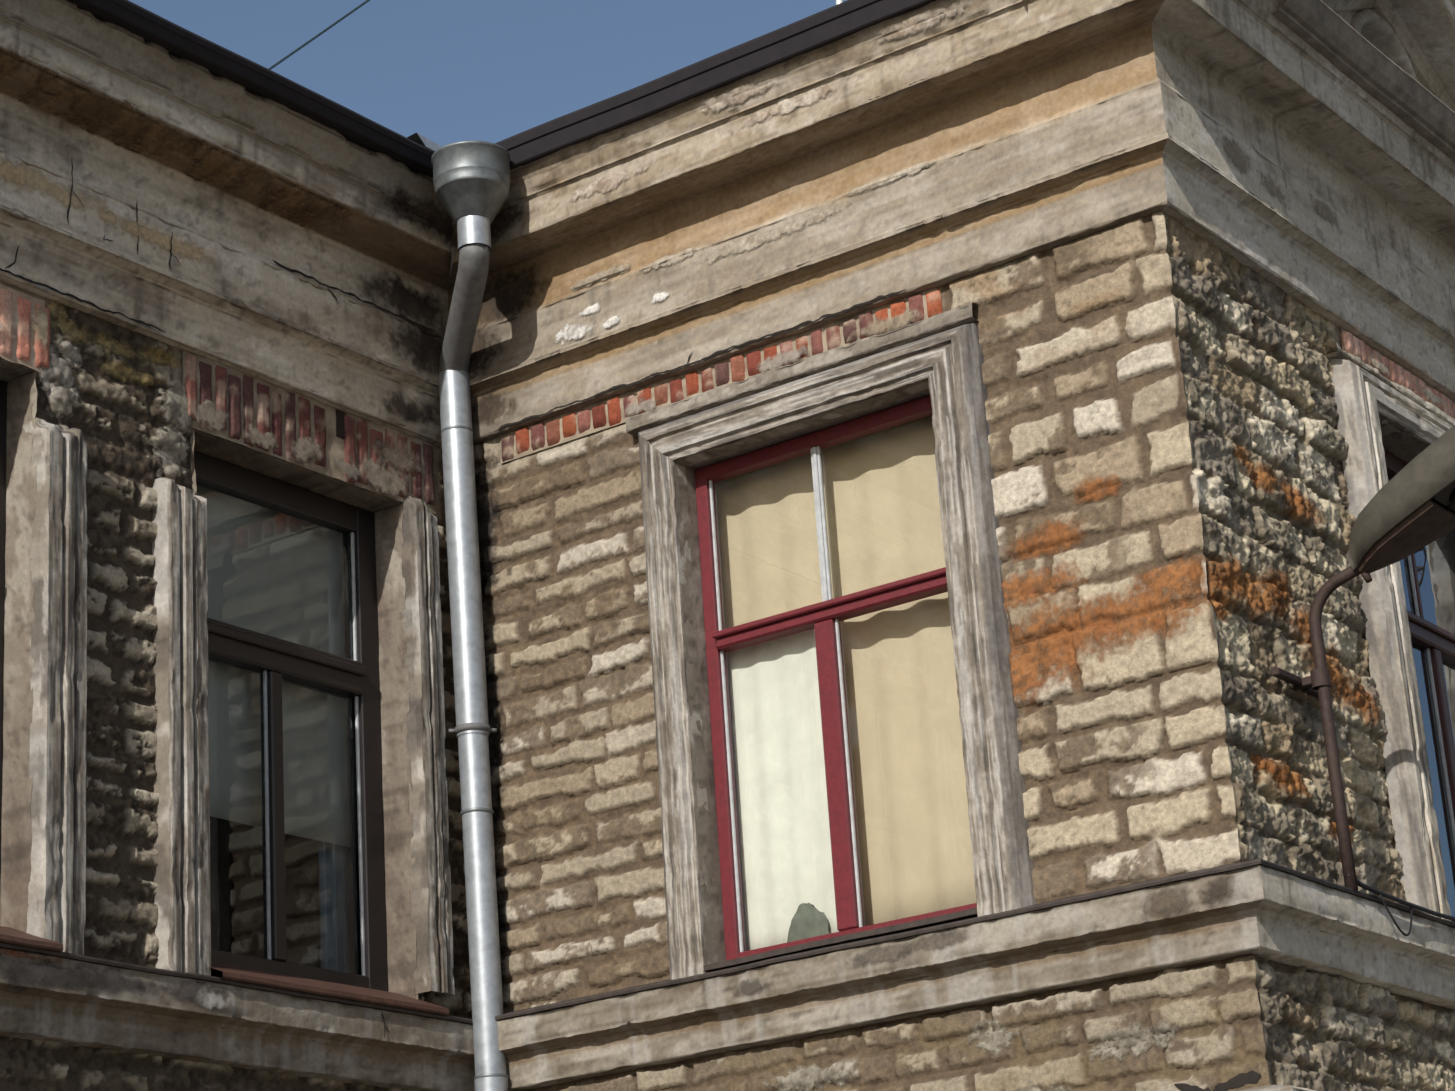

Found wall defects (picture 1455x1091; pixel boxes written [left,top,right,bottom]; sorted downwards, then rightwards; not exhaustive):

leakage [384,189,458,248]
leakage [490,207,523,239]
crack [272,259,439,334]
leakage [360,273,444,374]
leakage [468,268,536,379]
leakage [387,393,441,424]
leakage [471,393,515,424]
flaking render [499,287,943,464]